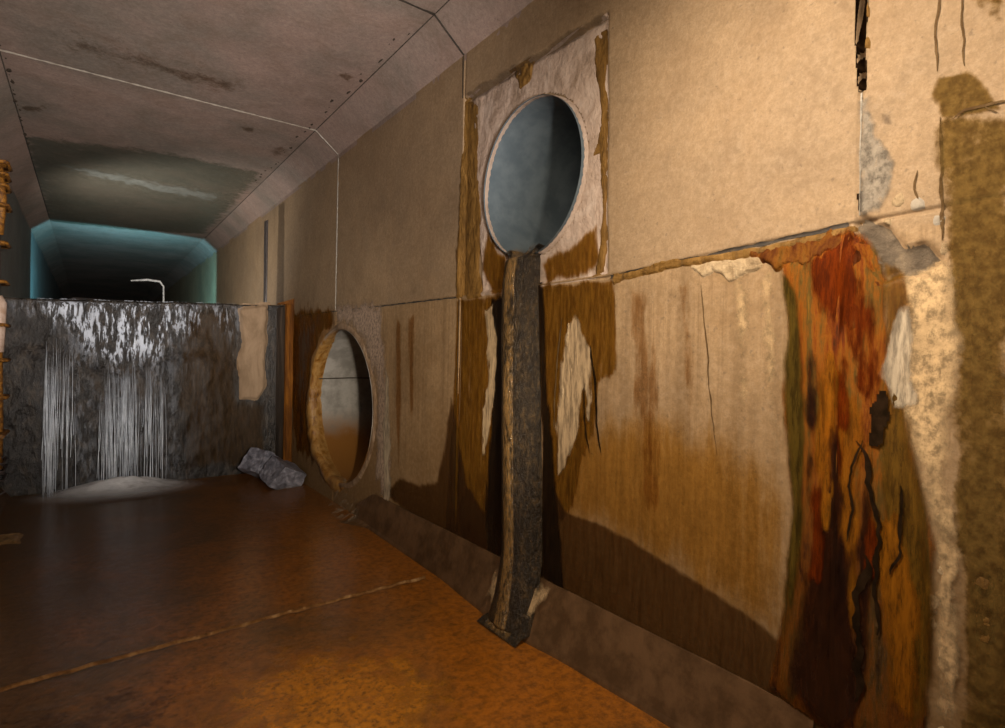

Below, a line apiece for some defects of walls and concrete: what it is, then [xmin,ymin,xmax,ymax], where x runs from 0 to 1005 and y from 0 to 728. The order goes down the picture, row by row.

crack [855,0,871,92]
crack [934,0,965,71]
crack [855,194,863,212]
peeling [337,301,391,501]
spalling [456,12,961,728]
rust [749,229,935,728]
crack [847,391,903,703]
leakage [935,117,1005,728]